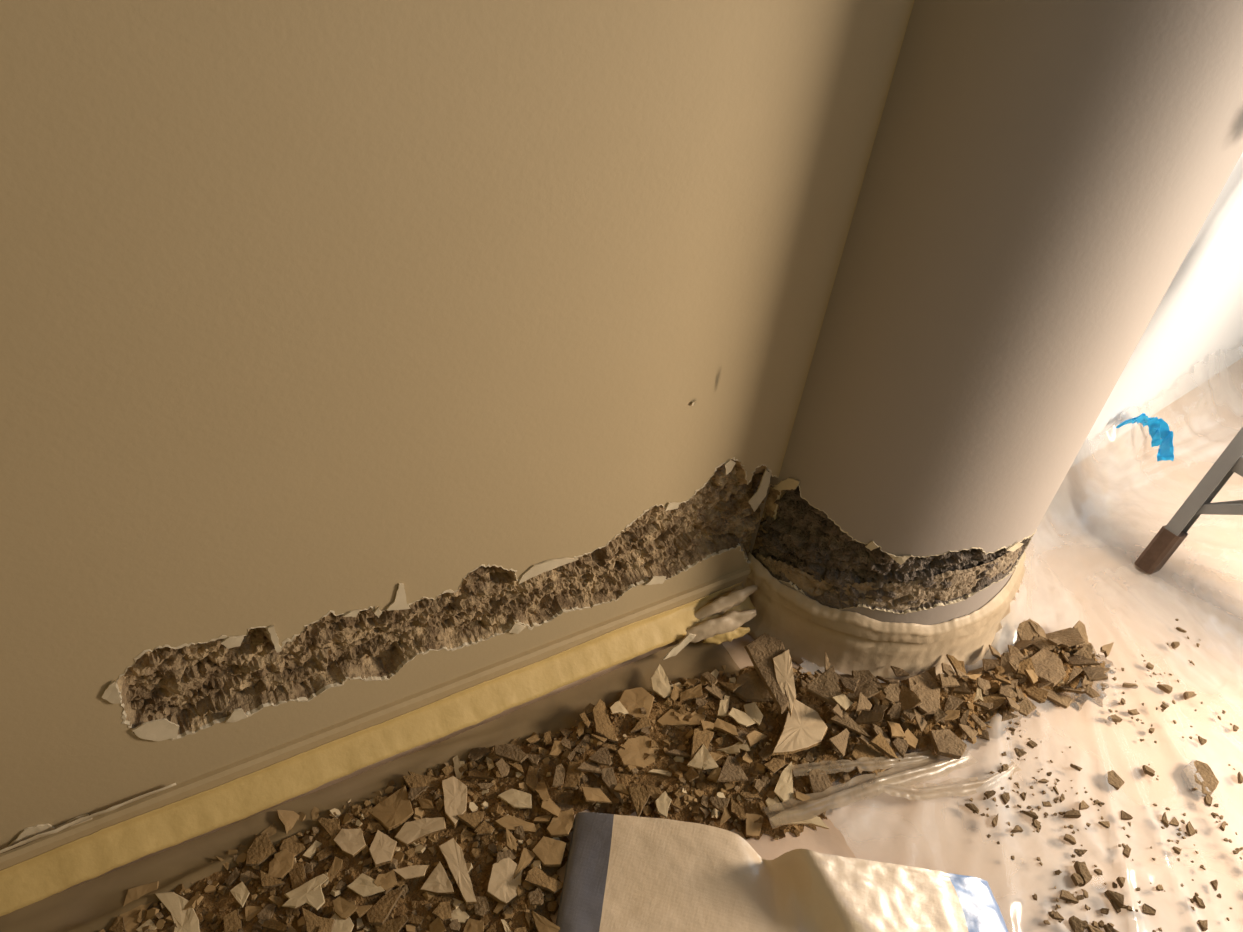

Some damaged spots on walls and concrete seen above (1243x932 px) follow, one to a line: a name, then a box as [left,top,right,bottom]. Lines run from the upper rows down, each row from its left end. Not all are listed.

flaking render [101,457,1037,741]